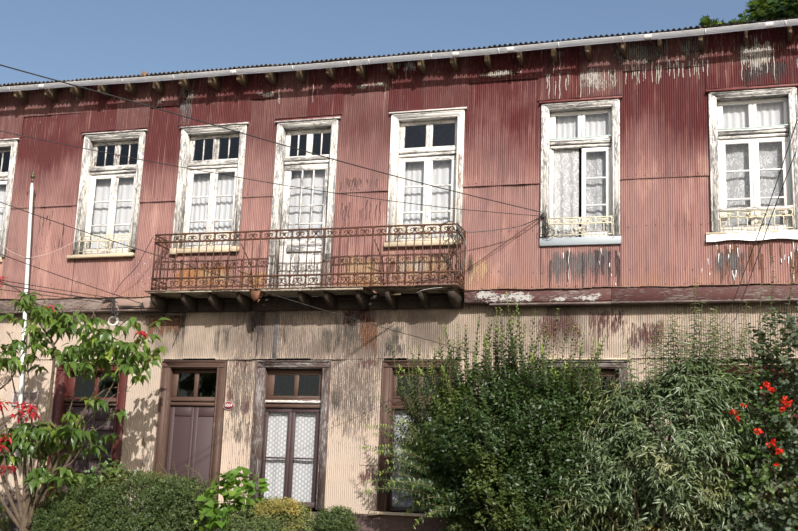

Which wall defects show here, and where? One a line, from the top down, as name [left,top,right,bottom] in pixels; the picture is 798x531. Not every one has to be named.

peeling [546,50,569,99]
peeling [580,38,708,97]
peeling [740,36,776,77]
rust [341,252,452,286]
peeling [473,290,533,302]
water stain [251,311,265,358]